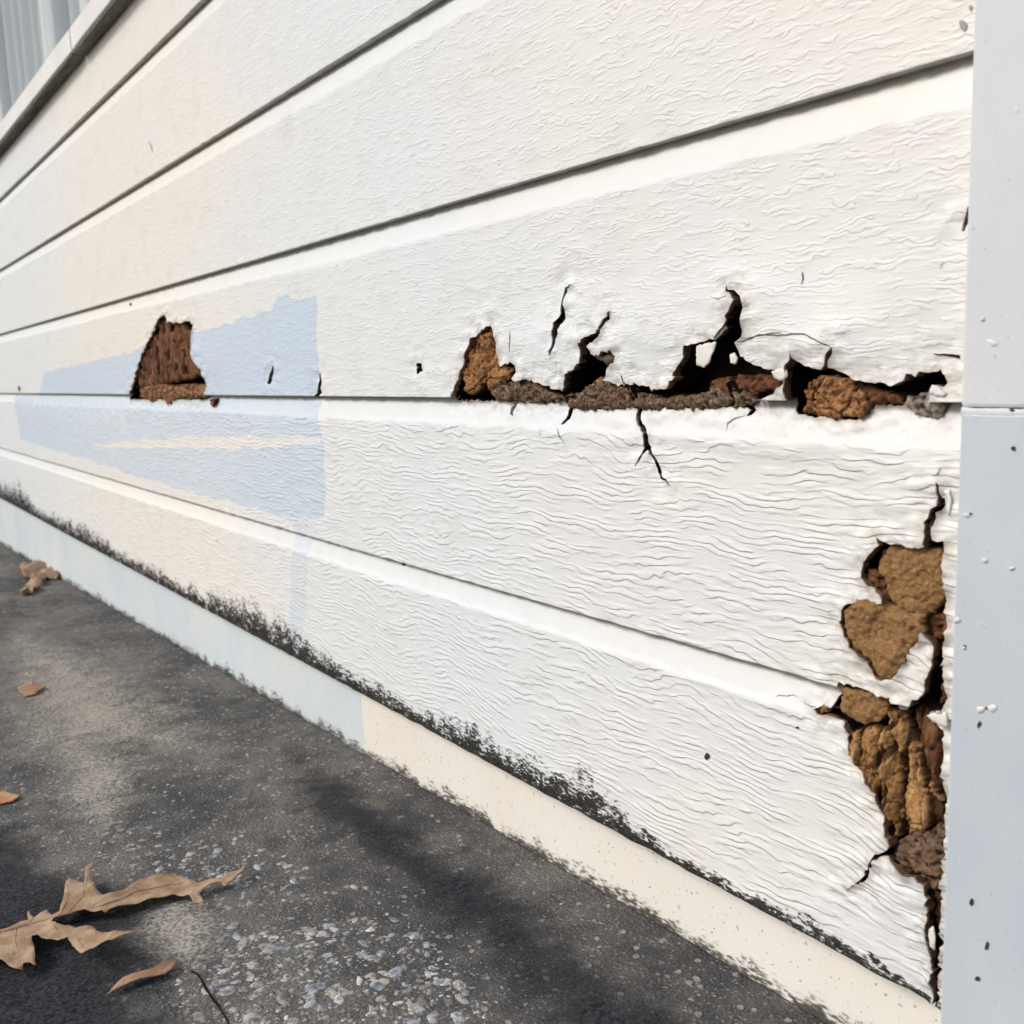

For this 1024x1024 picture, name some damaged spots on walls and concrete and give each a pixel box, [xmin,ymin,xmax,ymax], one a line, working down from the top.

spalling [132,316,191,400]
spalling [456,326,501,401]
spalling [555,332,608,397]
spalling [633,290,849,417]
spalling [868,371,947,397]
crack [626,385,669,485]
peeling [927,489,952,546]
spalling [865,542,891,601]
mould [0,479,941,1010]
spalling [822,684,890,739]
spalling [907,632,949,729]
spalling [877,791,944,1003]